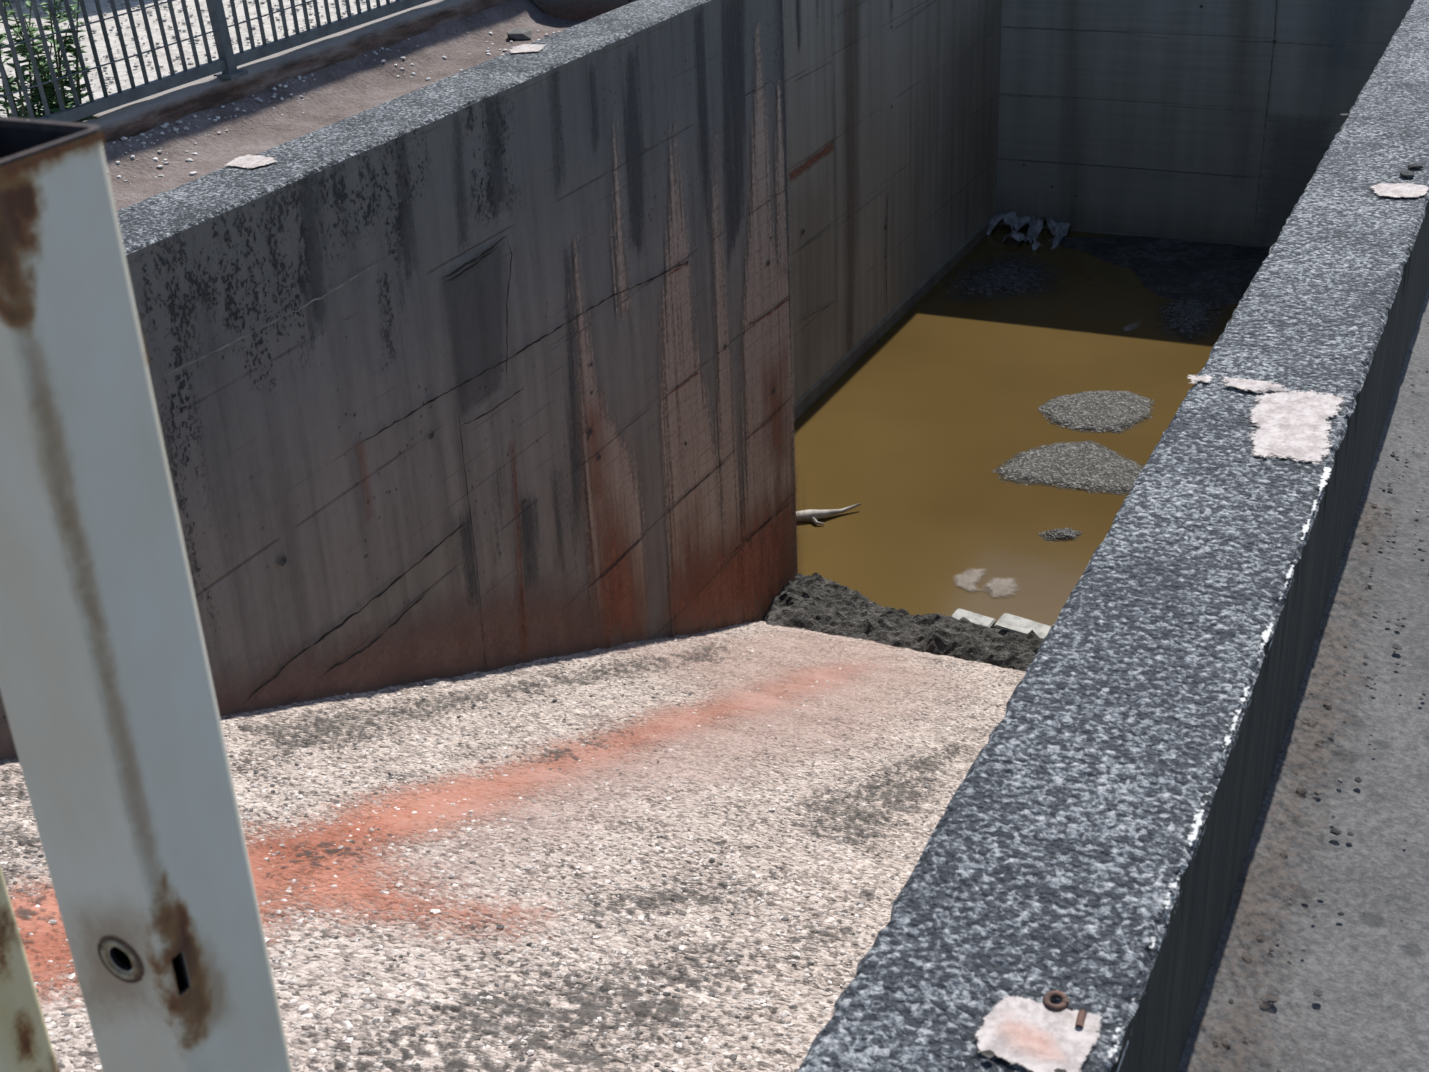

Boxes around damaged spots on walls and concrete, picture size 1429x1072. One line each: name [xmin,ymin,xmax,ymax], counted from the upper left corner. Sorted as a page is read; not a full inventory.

corrosion [0,131,105,328]
crack [164,263,379,376]
leakage [139,129,427,582]
crack [245,235,689,702]
leakage [555,244,648,649]
crack [592,395,793,585]
leakage [659,0,800,637]
corrosion [671,494,796,635]
spalling [1188,375,1343,540]
spalling [1371,183,1429,197]
corrosion [148,875,211,1048]
spalling [975,990,1132,1072]